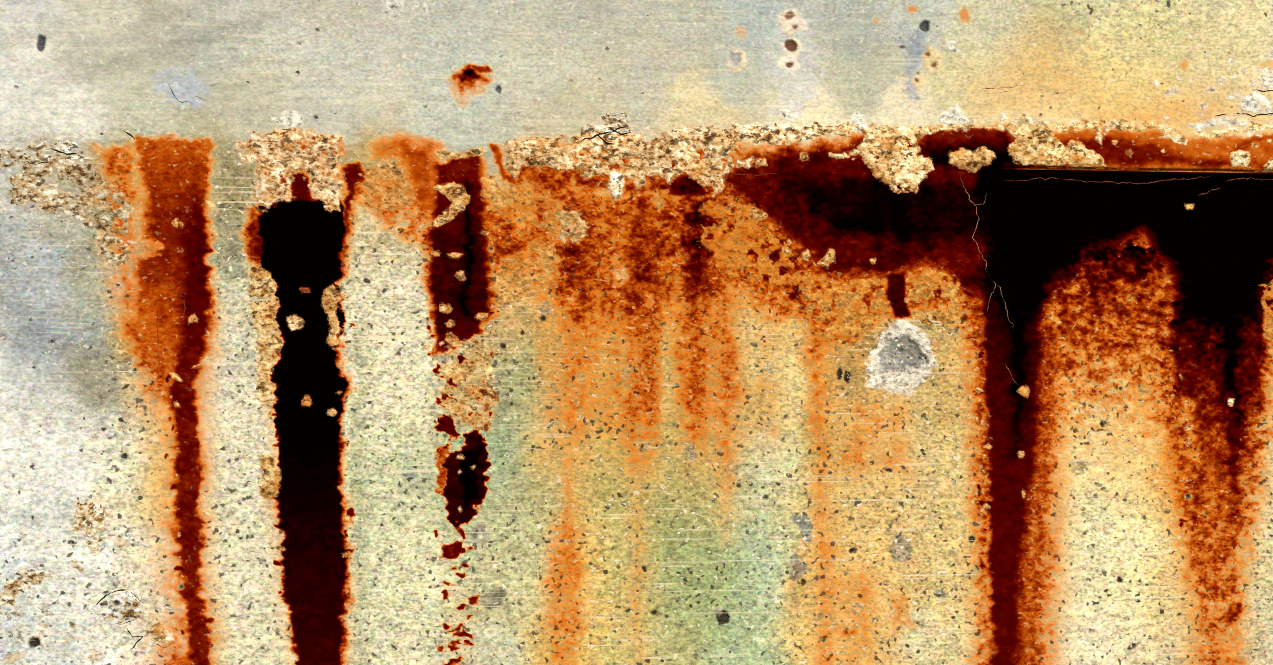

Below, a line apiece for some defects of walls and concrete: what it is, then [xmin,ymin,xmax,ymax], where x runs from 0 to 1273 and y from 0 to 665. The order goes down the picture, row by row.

rust [443,61,500,110]
peeling [925,40,958,68]
spalling [0,137,166,272]
spalling [227,49,1273,289]
peeling [878,267,966,374]
rust [86,129,235,665]
rust [239,118,1273,665]